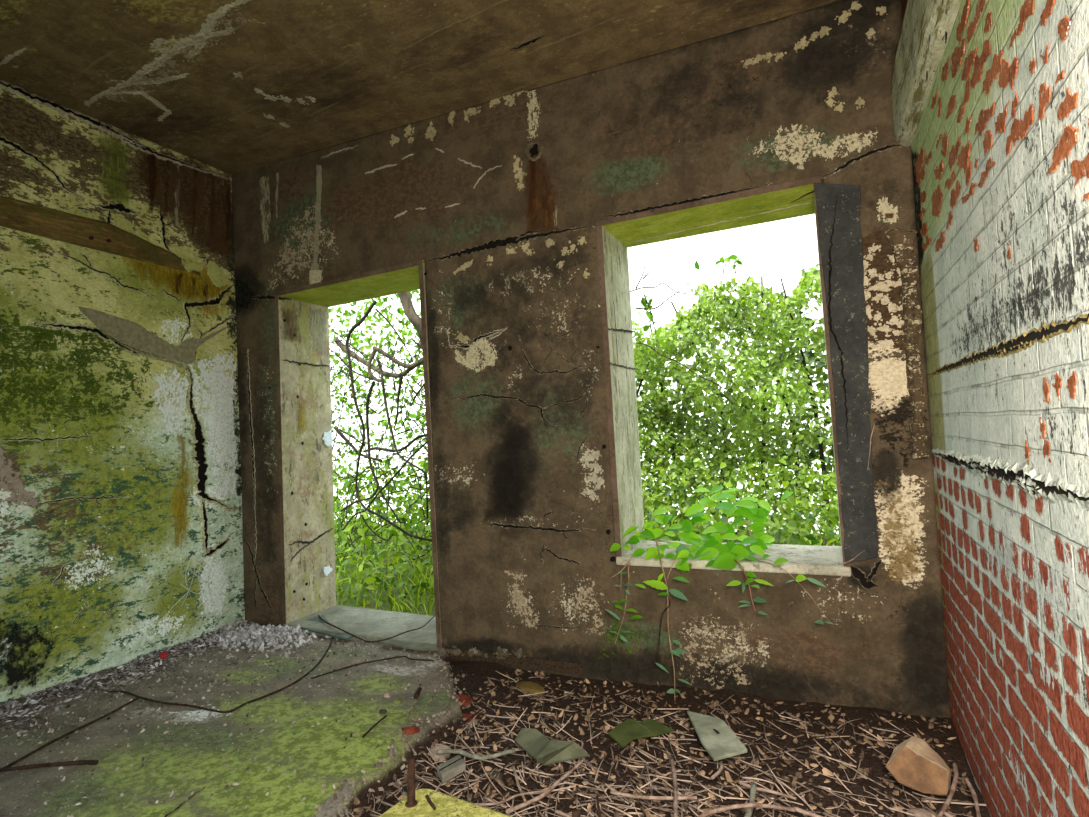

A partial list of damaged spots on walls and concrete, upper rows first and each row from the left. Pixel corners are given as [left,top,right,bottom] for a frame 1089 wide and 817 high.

damp [83,0,251,121]
damp [527,90,540,139]
rust [527,155,557,231]
peeling [773,124,878,165]
peeling [911,0,1089,259]
crack [0,136,292,618]
damp [196,350,239,498]
crack [820,143,902,454]
peeling [862,197,905,350]
crack [927,313,1089,377]
crack [931,447,1089,511]
peeling [932,454,1089,817]